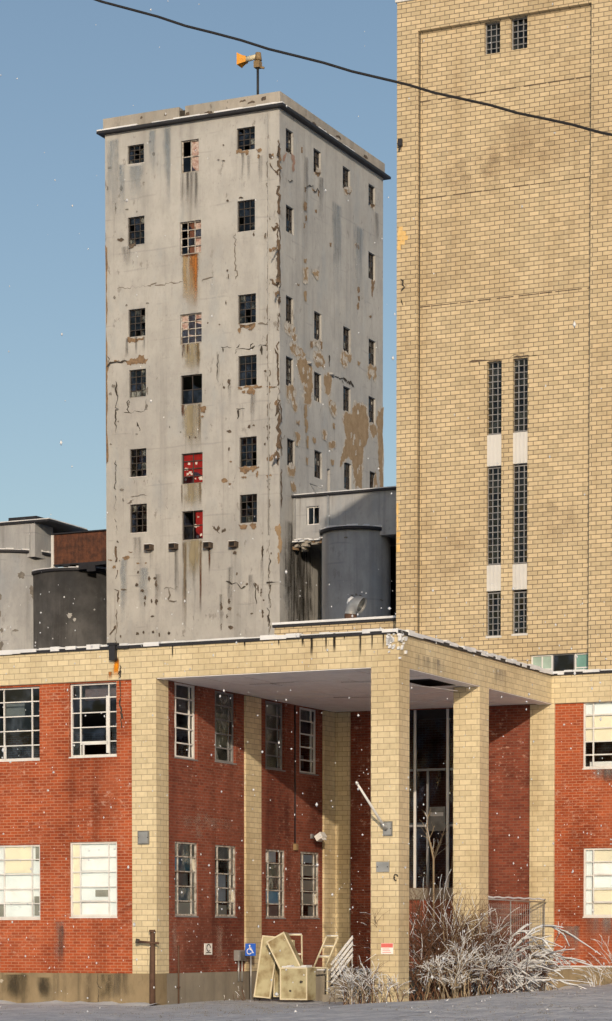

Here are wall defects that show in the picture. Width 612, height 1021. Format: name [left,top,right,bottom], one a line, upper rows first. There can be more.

crack [119,277,211,289]
rust [183,254,197,292]
crack [217,140,319,632]
peeling [223,321,384,493]
water stain [8,975,23,994]
water stain [39,978,48,994]